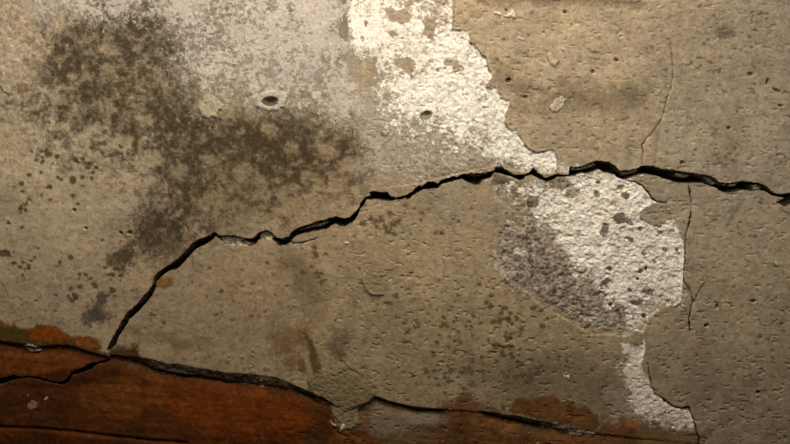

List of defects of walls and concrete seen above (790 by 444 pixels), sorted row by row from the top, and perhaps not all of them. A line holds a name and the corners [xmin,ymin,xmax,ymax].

leakage [0,0,368,327]
leakage [360,211,400,236]
crack [0,45,790,386]
spalling [338,0,689,338]
rust [0,321,384,444]
rust [417,393,660,444]
peeling [640,356,699,435]
crack [648,366,700,444]